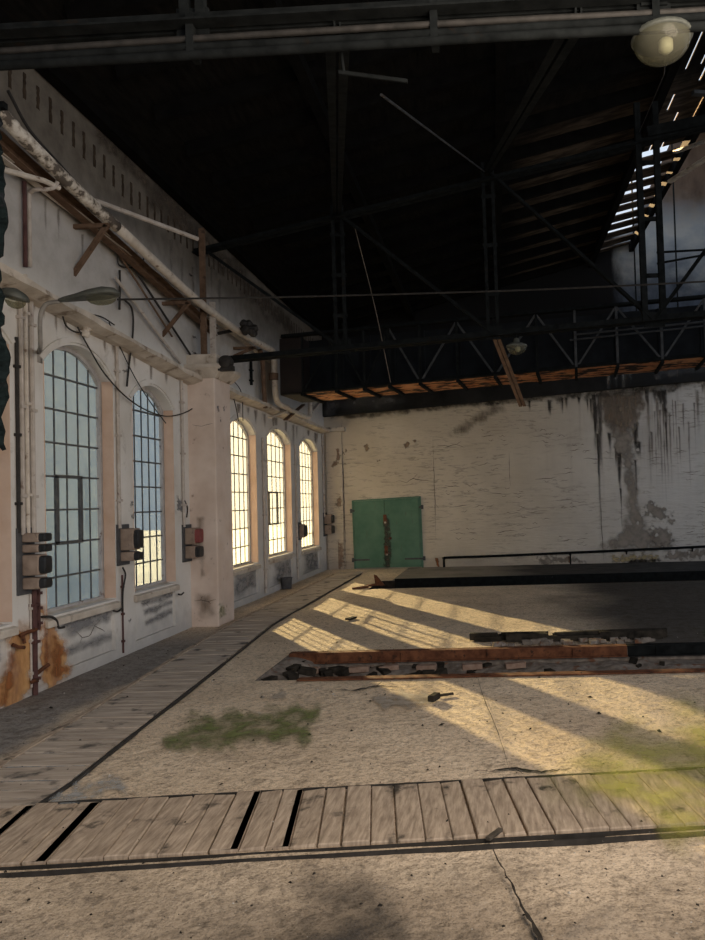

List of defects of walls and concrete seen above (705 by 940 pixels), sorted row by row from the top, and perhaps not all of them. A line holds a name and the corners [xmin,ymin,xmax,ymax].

leakage [325,367,705,495]
flaking render [601,392,675,550]
spalling [369,571,705,589]
rust [0,609,70,707]
crack [492,848,543,940]